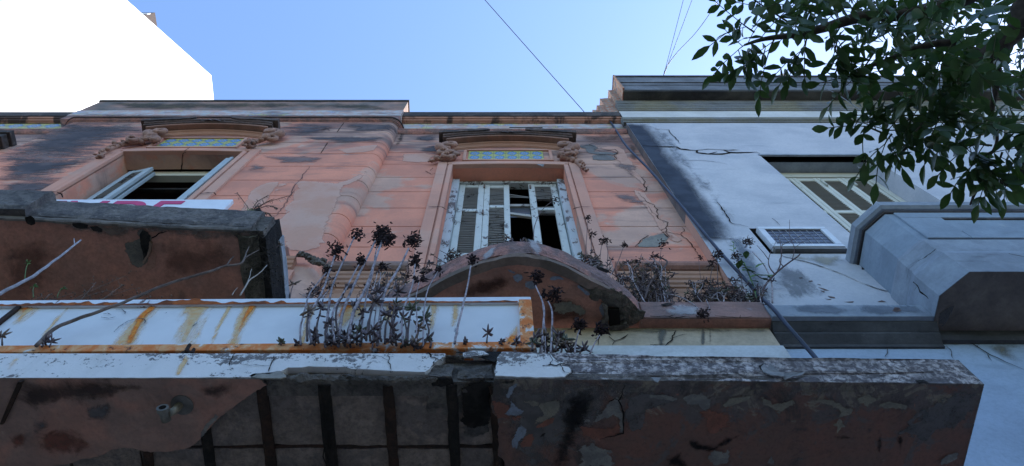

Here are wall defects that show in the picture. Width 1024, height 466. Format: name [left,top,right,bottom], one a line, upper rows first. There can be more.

water stain [5,125,138,190]
crack [658,129,758,163]
peeling [237,175,363,299]
crack [639,177,748,261]
rust [117,307,155,344]
rust [182,307,207,341]
rust [213,306,255,344]
peeling [759,364,806,380]
spalling [54,351,560,466]
peeling [578,443,615,466]